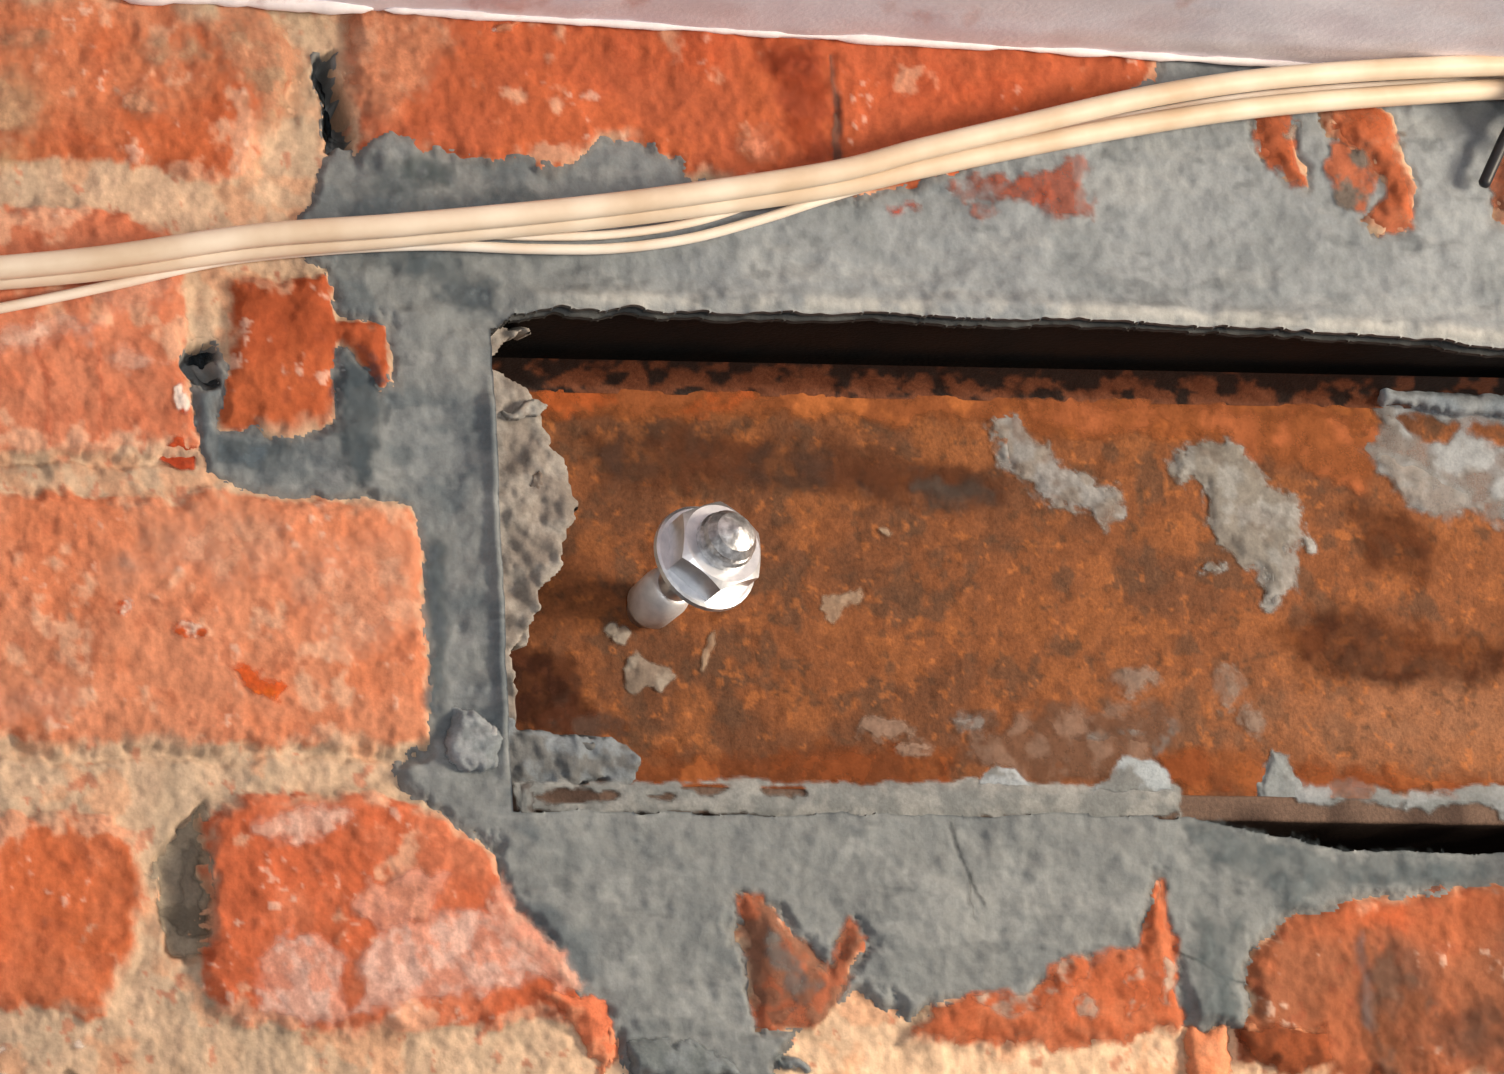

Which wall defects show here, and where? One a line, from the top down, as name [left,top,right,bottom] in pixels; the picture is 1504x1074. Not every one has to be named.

spalling [1254,115,1305,186]
spalling [1324,108,1413,234]
spalling [1490,158,1504,210]
corrosion [529,389,1378,495]
corrosion [1301,614,1504,683]
corrosion [509,644,627,737]
corrosion [631,744,954,789]
corrosion [1157,747,1266,796]
corrosion [1294,762,1490,798]
spalling [737,895,865,1028]
spalling [912,879,1185,1052]